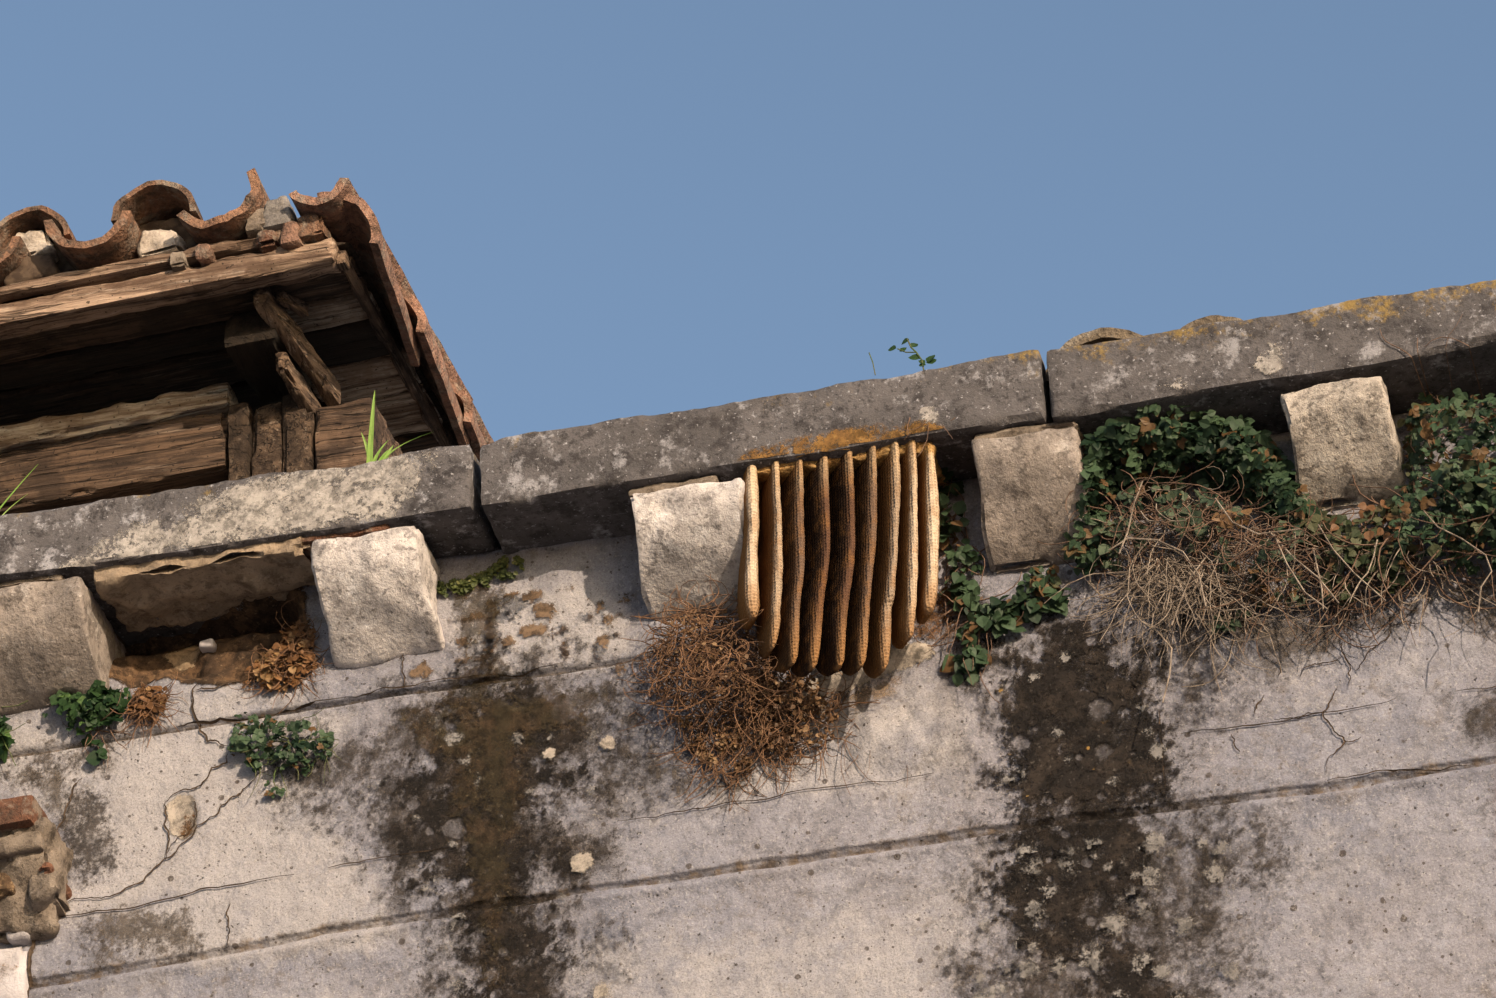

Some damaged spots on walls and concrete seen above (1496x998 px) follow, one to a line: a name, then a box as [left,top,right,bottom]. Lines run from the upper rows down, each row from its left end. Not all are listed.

flaking render [109,587,312,692]
crack [27,655,556,998]
water stain [272,633,775,998]
crack [617,773,931,821]
water stain [940,586,1419,998]
crack [1159,620,1467,797]
water stain [1430,576,1496,639]
water stain [1452,688,1496,744]